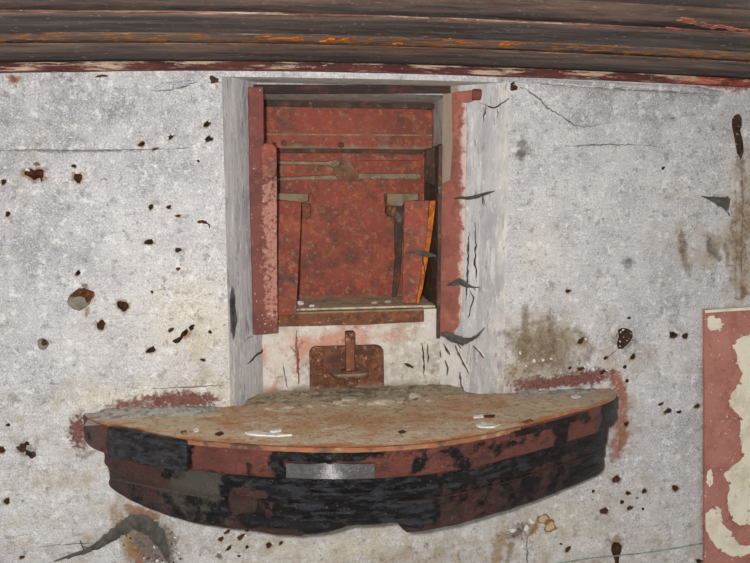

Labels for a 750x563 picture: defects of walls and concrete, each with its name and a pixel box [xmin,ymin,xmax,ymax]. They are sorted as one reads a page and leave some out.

corrosion [416,200,436,304]
crack [466,225,477,318]
crack [421,343,429,375]
peeling [706,315,724,332]
peeling [705,333,750,558]
spalling [123,528,183,563]